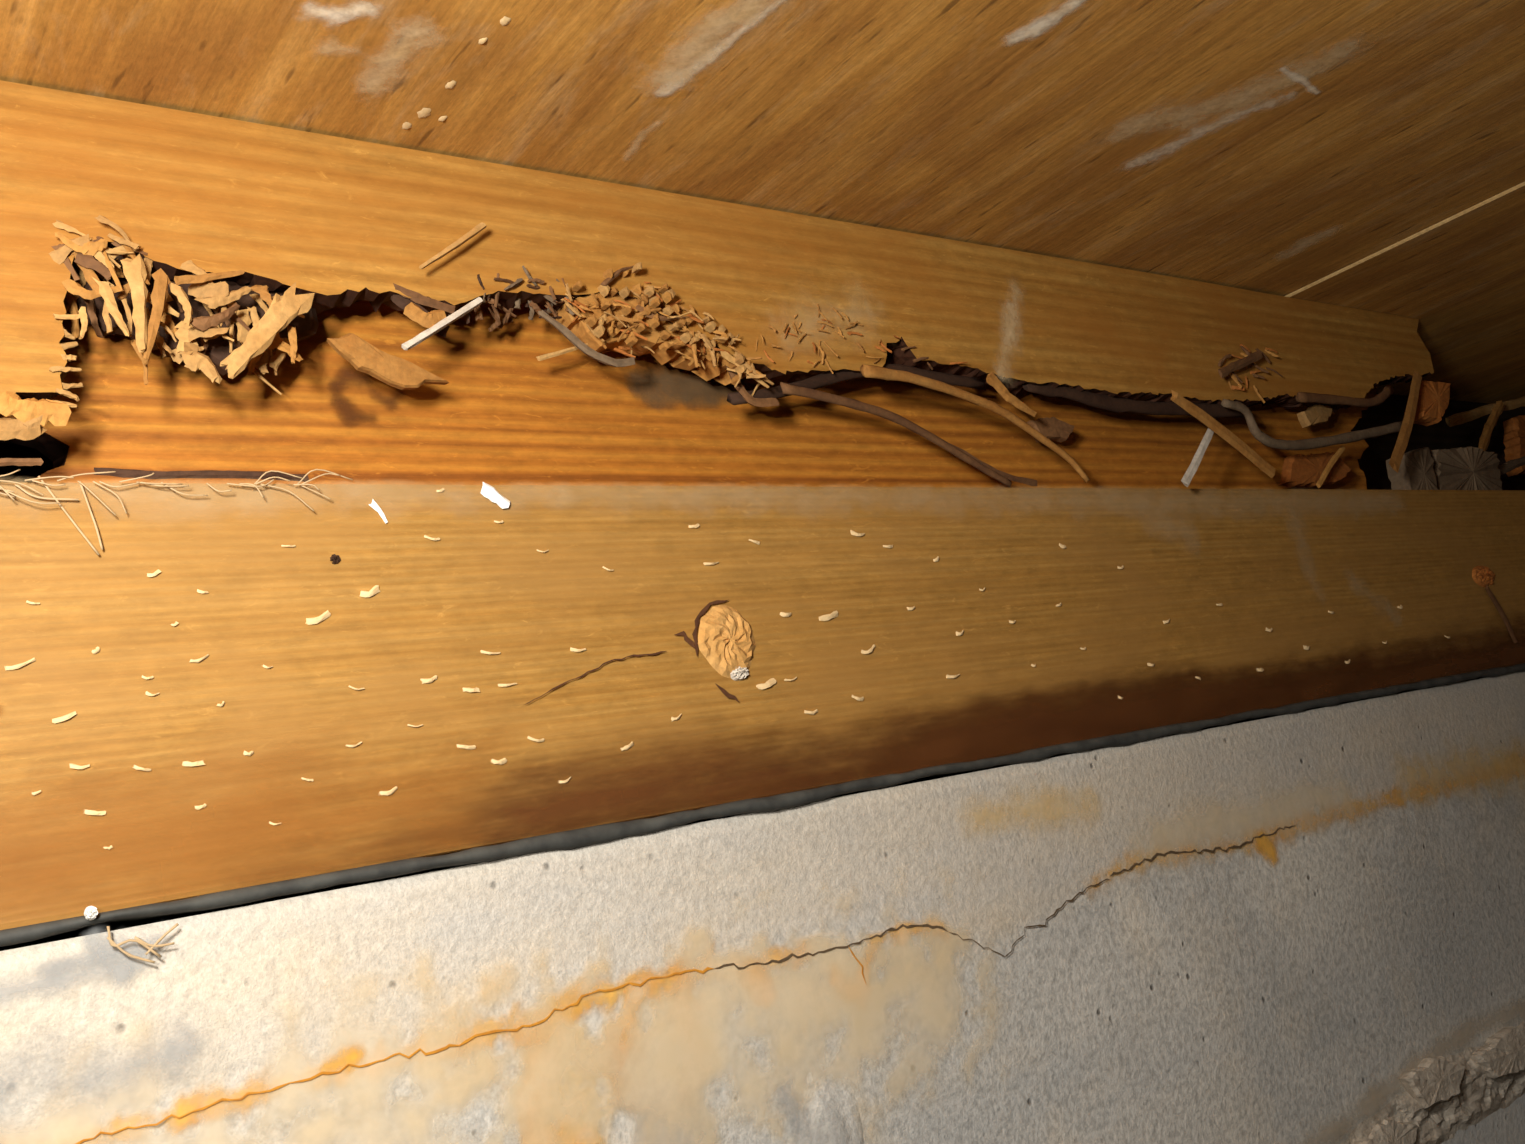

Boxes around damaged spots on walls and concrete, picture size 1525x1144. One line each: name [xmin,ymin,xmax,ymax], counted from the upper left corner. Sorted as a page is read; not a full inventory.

peeling [327,333,449,390]
peeling [480,482,510,509]
leakage [0,622,1525,899]
corrosion [21,1115,141,1144]
corrosion [170,921,954,1144]
crack [75,825,1295,1144]
spalling [1322,1004,1525,1144]